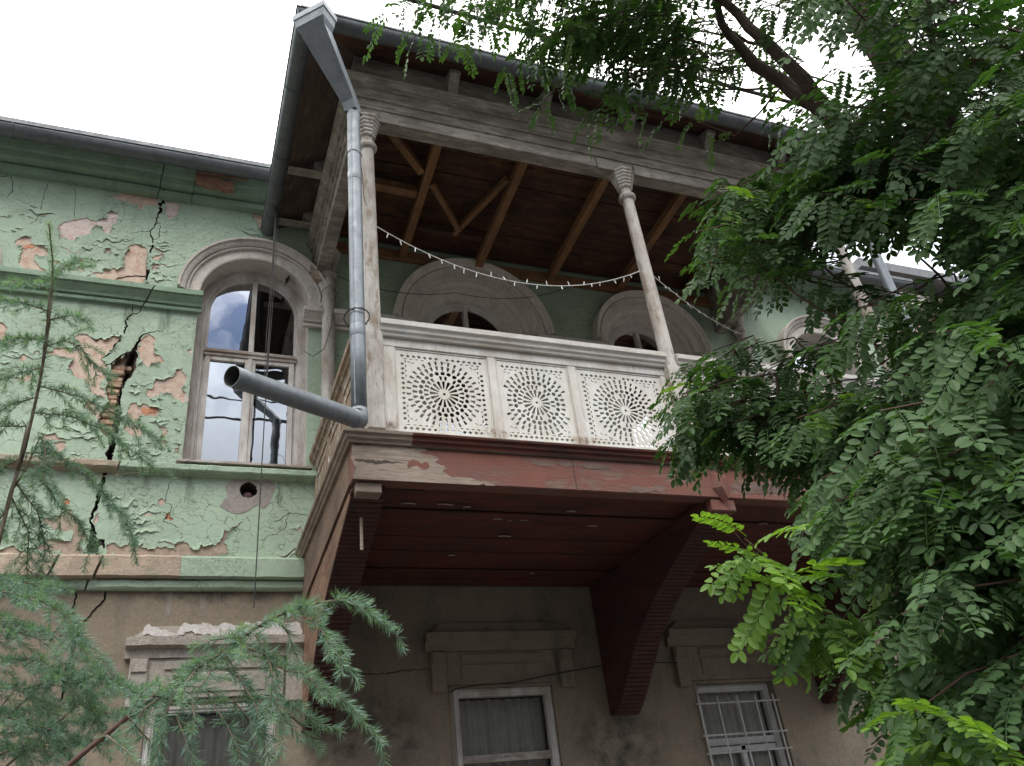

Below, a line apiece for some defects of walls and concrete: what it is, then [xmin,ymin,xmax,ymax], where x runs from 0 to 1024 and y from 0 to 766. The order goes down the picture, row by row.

peeling [0,193,183,287]
crack [116,200,165,280]
peeling [0,322,190,460]
crack [83,307,163,554]
peeling [351,444,495,505]
peeling [530,460,612,469]
peeling [633,485,666,493]
peeling [731,481,810,494]
peeling [0,491,241,557]
peeling [143,621,303,636]